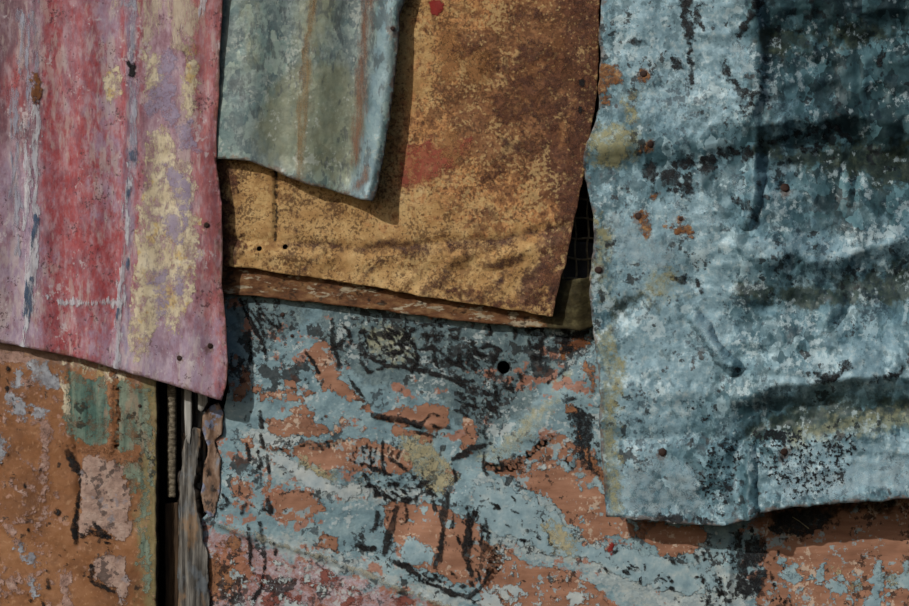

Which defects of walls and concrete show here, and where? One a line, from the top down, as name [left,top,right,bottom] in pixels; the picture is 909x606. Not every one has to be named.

rust [216,0,623,360]
rust [631,210,652,239]
rust [662,215,695,239]
peeling [669,273,703,294]
peeling [813,360,853,384]
spalling [0,349,157,606]
spalling [200,402,251,517]
peeling [208,525,451,606]
peeling [231,341,453,523]
peeling [459,416,478,456]
peeling [382,426,724,606]
peeling [686,425,909,606]